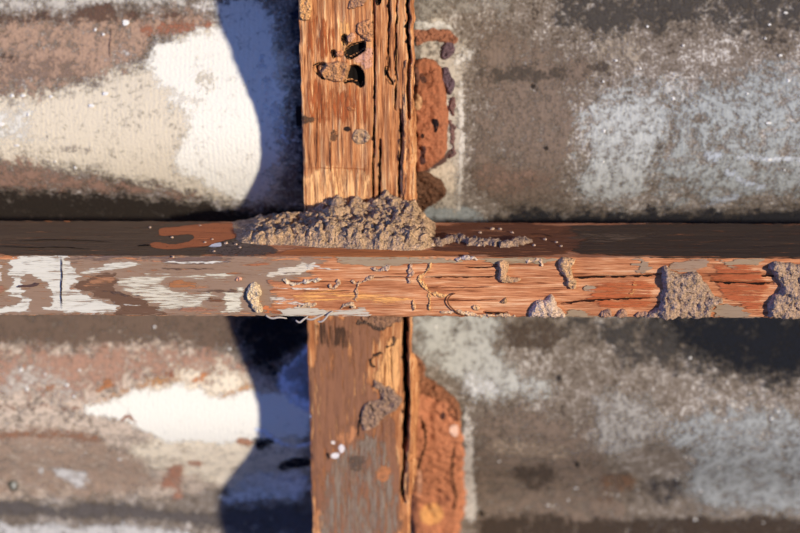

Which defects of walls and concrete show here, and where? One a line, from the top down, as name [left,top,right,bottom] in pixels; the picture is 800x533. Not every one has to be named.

water stain [0,0,316,222]
crack [317,0,411,198]
water stain [415,0,800,224]
peeling [0,255,243,315]
peeling [260,262,315,277]
peeling [270,297,372,316]
crack [384,317,411,496]
water stain [413,316,800,533]